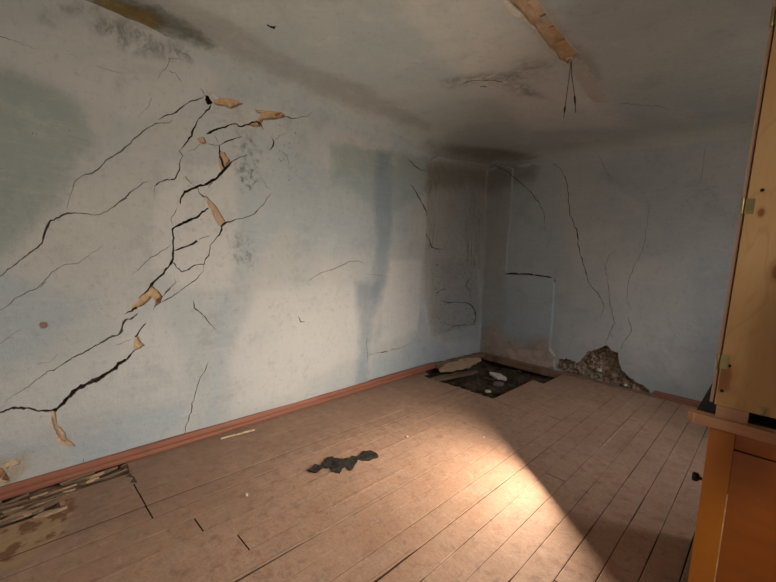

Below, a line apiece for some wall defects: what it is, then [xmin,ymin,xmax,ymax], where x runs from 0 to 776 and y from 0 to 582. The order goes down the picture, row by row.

leakage [86,0,209,44]
spalling [205,92,243,109]
spalling [250,109,285,127]
spalling [206,196,226,227]
crack [0,88,307,413]
crack [554,164,649,349]
crack [505,273,555,282]
spalling [132,286,163,311]
spalling [555,345,650,393]
peeling [50,411,75,446]